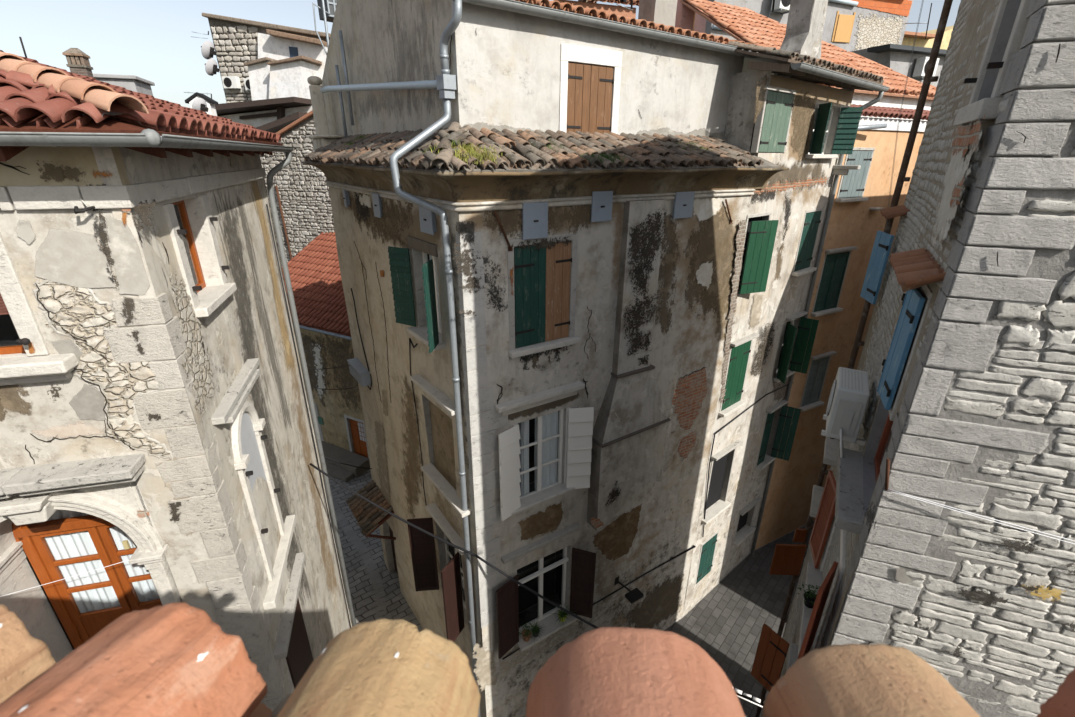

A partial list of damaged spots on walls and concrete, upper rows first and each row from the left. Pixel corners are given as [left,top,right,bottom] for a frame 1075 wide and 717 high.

flaking render [951,113,986,157]
damp [90,209,119,289]
flaking render [170,269,217,421]
damp [454,204,592,313]
crack [583,306,596,398]
damp [623,205,739,366]
flaking render [671,218,748,463]
flaking render [749,293,763,329]
damp [750,322,775,376]
crack [25,420,133,464]
flaking render [516,501,565,542]
flaking render [591,502,643,603]